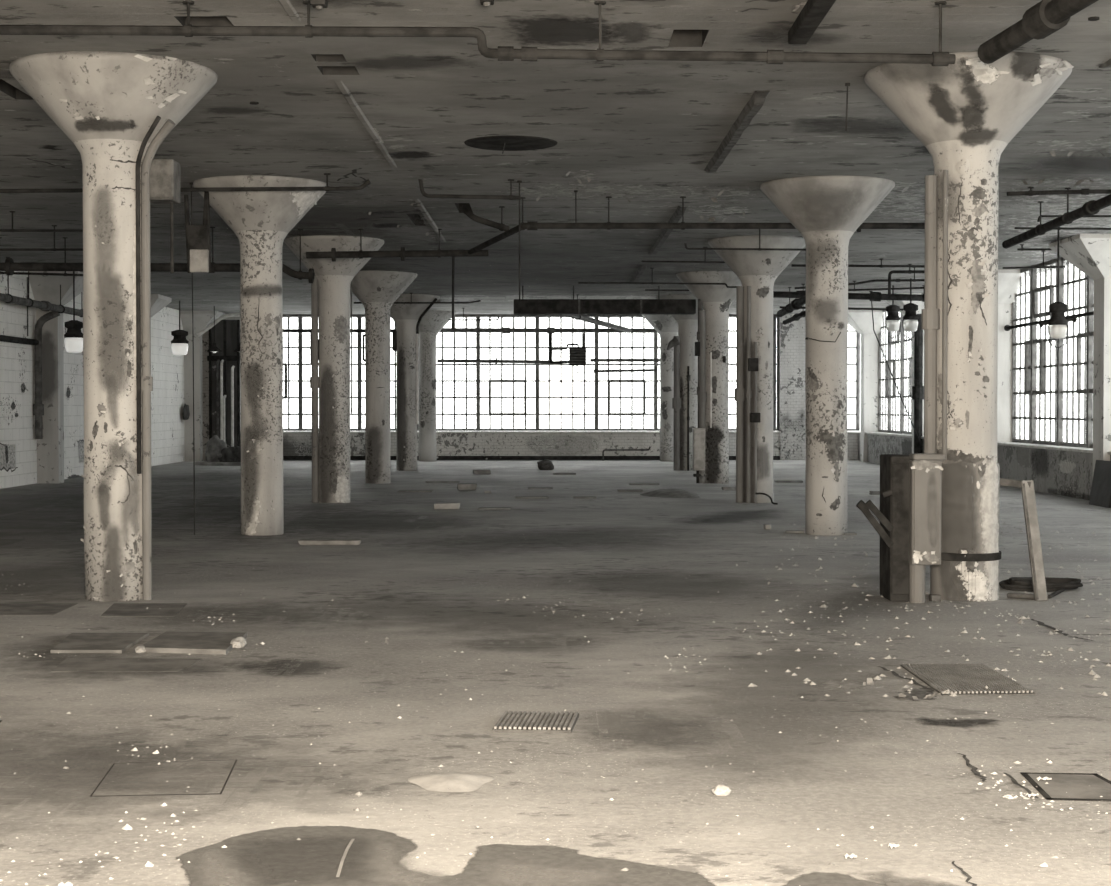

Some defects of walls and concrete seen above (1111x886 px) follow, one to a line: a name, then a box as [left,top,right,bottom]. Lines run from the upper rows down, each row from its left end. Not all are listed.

water stain [509,15,646,46]
water stain [886,60,996,146]
water stain [96,190,136,425]
peeling [0,347,29,425]
peeling [68,401,128,493]
peeling [247,358,283,457]
peeling [780,426,845,482]
peeling [807,367,823,399]
peeling [901,371,994,489]
crack [958,753,1038,798]
water stain [177,826,715,886]
water stain [783,872,953,886]